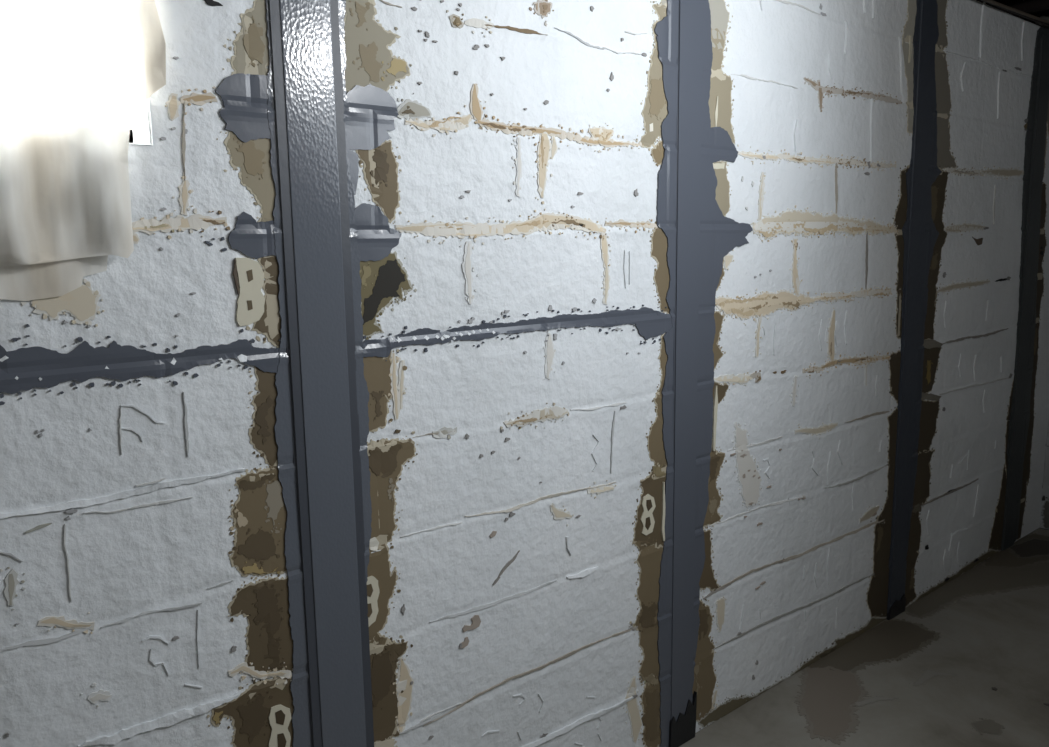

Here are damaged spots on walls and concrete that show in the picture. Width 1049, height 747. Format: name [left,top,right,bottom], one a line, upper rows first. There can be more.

peeling [636,0,668,167]
peeling [708,0,735,144]
peeling [901,0,917,136]
peeling [246,255,281,348]
peeling [650,222,670,314]
peeling [713,161,754,217]
peeling [905,0,957,607]
peeling [207,366,294,747]
peeling [363,349,418,747]
damp [794,495,1049,745]